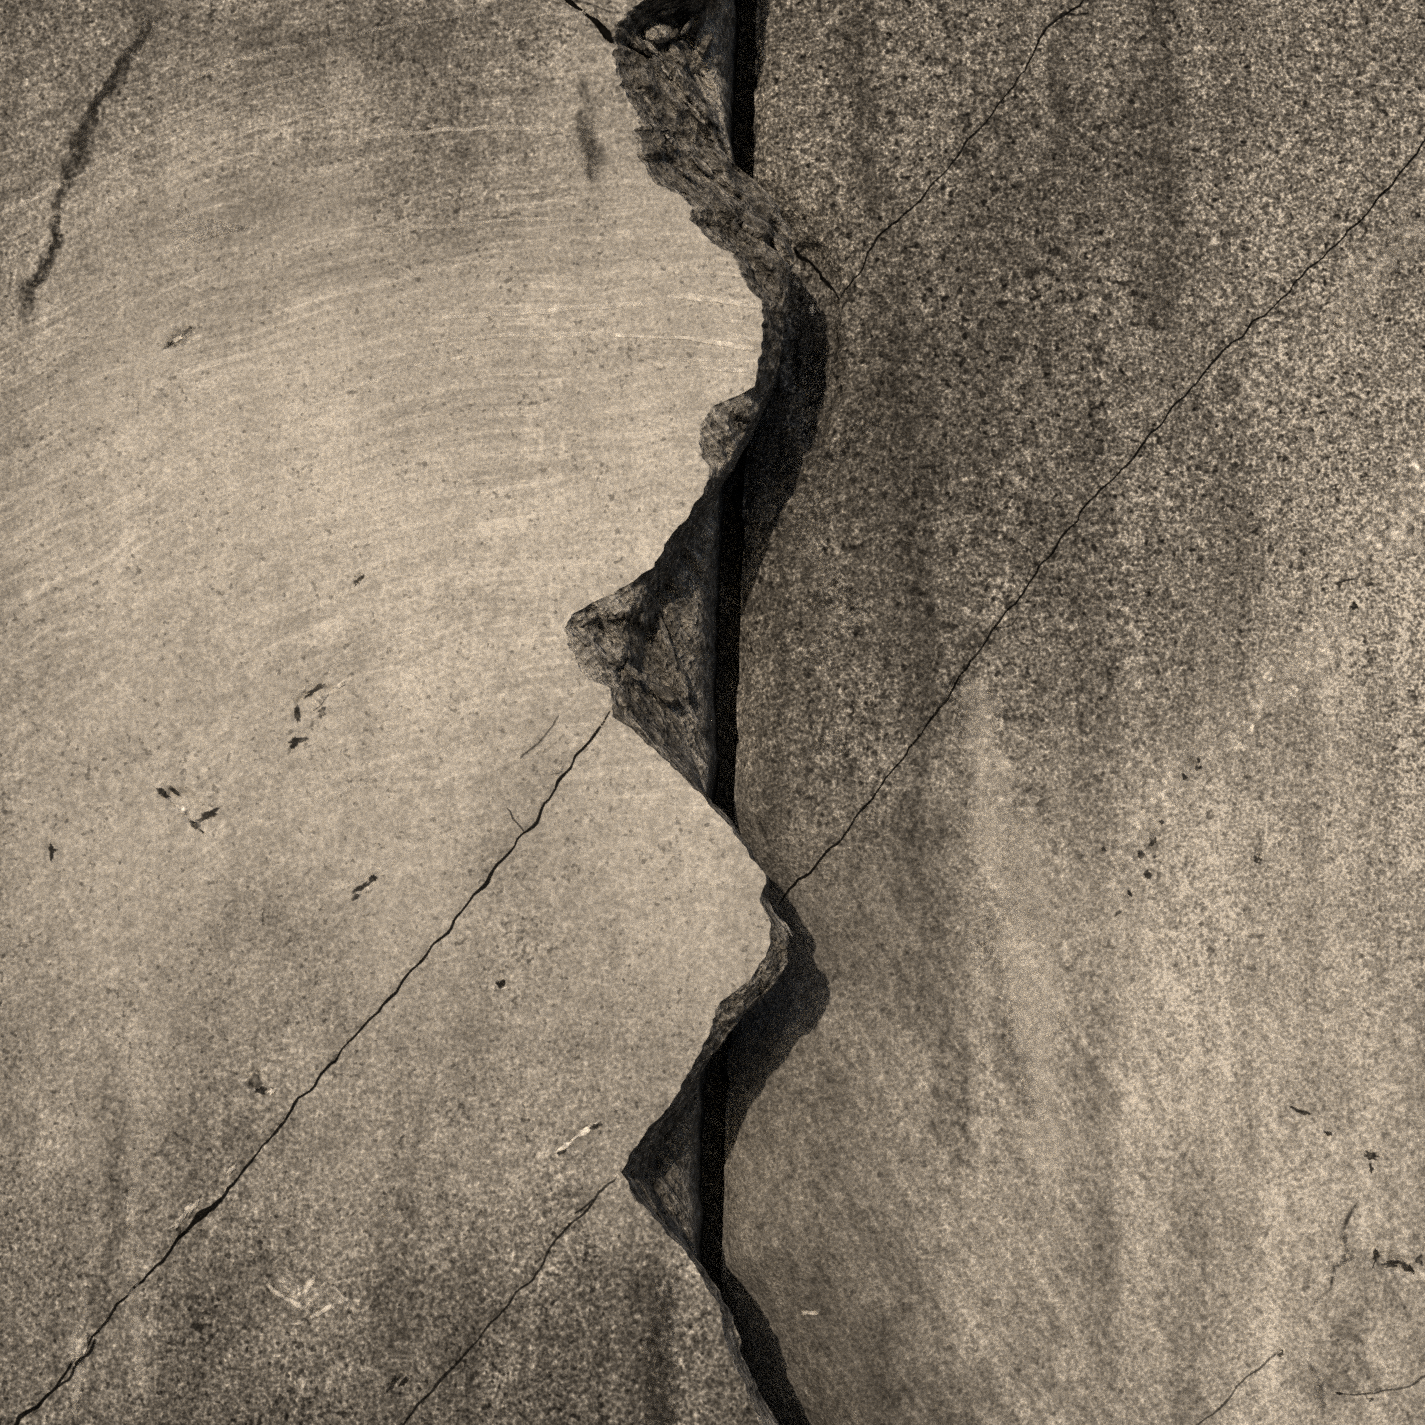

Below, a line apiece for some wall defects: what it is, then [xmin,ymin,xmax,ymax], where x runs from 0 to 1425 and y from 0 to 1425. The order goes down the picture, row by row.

crack [565,0,614,43]
crack [793,0,1092,299]
crack [14,711,616,1425]
spalling [556,1121,603,1155]
spalling [564,0,801,1425]
crack [778,139,1425,905]